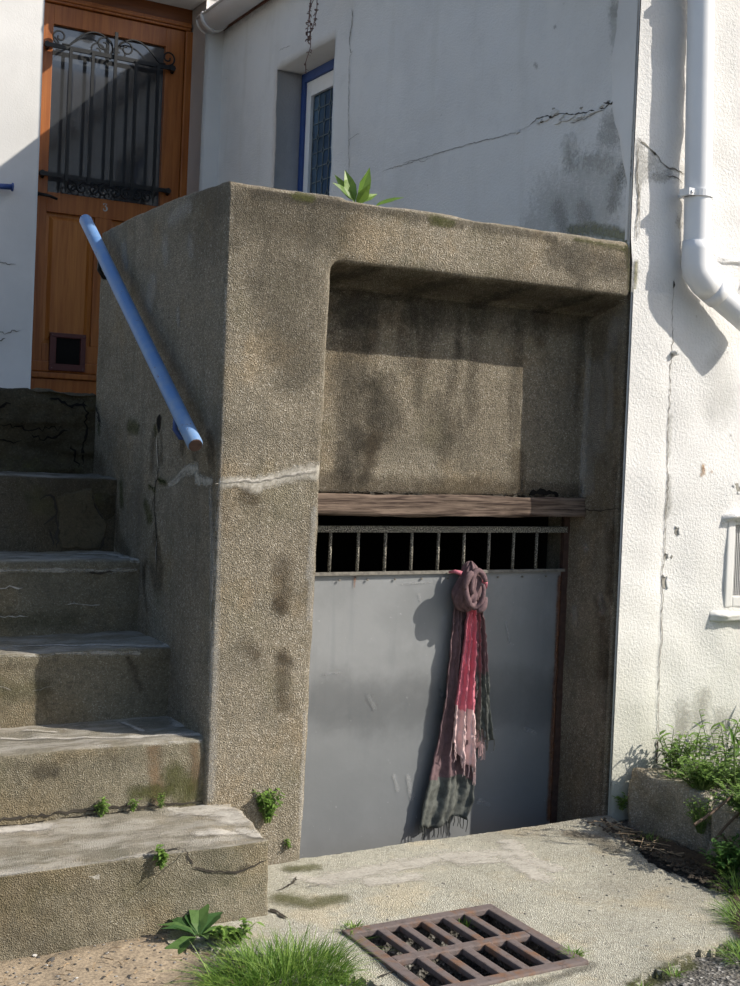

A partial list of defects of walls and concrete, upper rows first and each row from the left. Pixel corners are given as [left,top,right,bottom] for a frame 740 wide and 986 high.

crack [387,100,613,170]
crack [630,137,683,241]
crack [0,398,101,468]
crack [144,433,166,583]
crack [0,801,201,825]
crack [150,847,266,874]